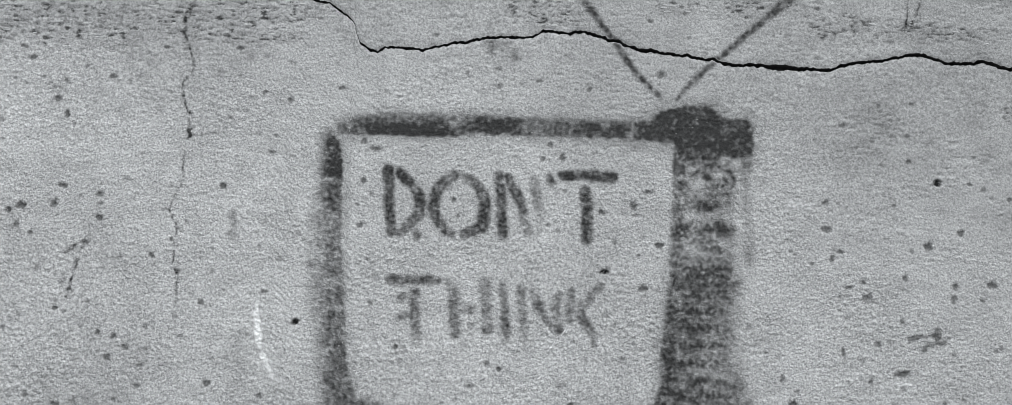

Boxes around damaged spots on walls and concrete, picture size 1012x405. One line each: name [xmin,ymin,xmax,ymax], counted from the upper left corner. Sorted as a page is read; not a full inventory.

crack [313,0,1012,72]
crack [182,12,193,137]
crack [64,241,85,298]